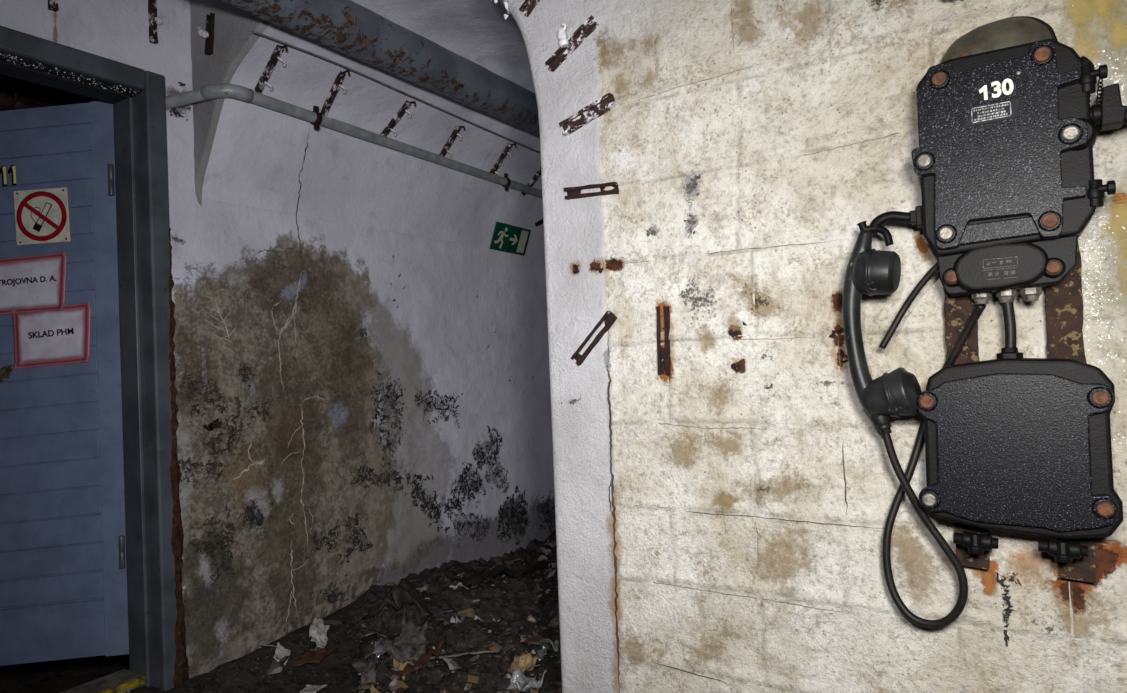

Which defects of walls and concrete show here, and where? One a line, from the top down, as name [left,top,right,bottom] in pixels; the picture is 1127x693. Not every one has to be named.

damp [1068,0,1127,57]
crack [296,134,309,275]
corrosion [570,257,624,274]
corrosion [168,228,189,687]
damp [173,235,398,678]
corrosion [973,560,999,595]
corrosion [1044,539,1127,613]